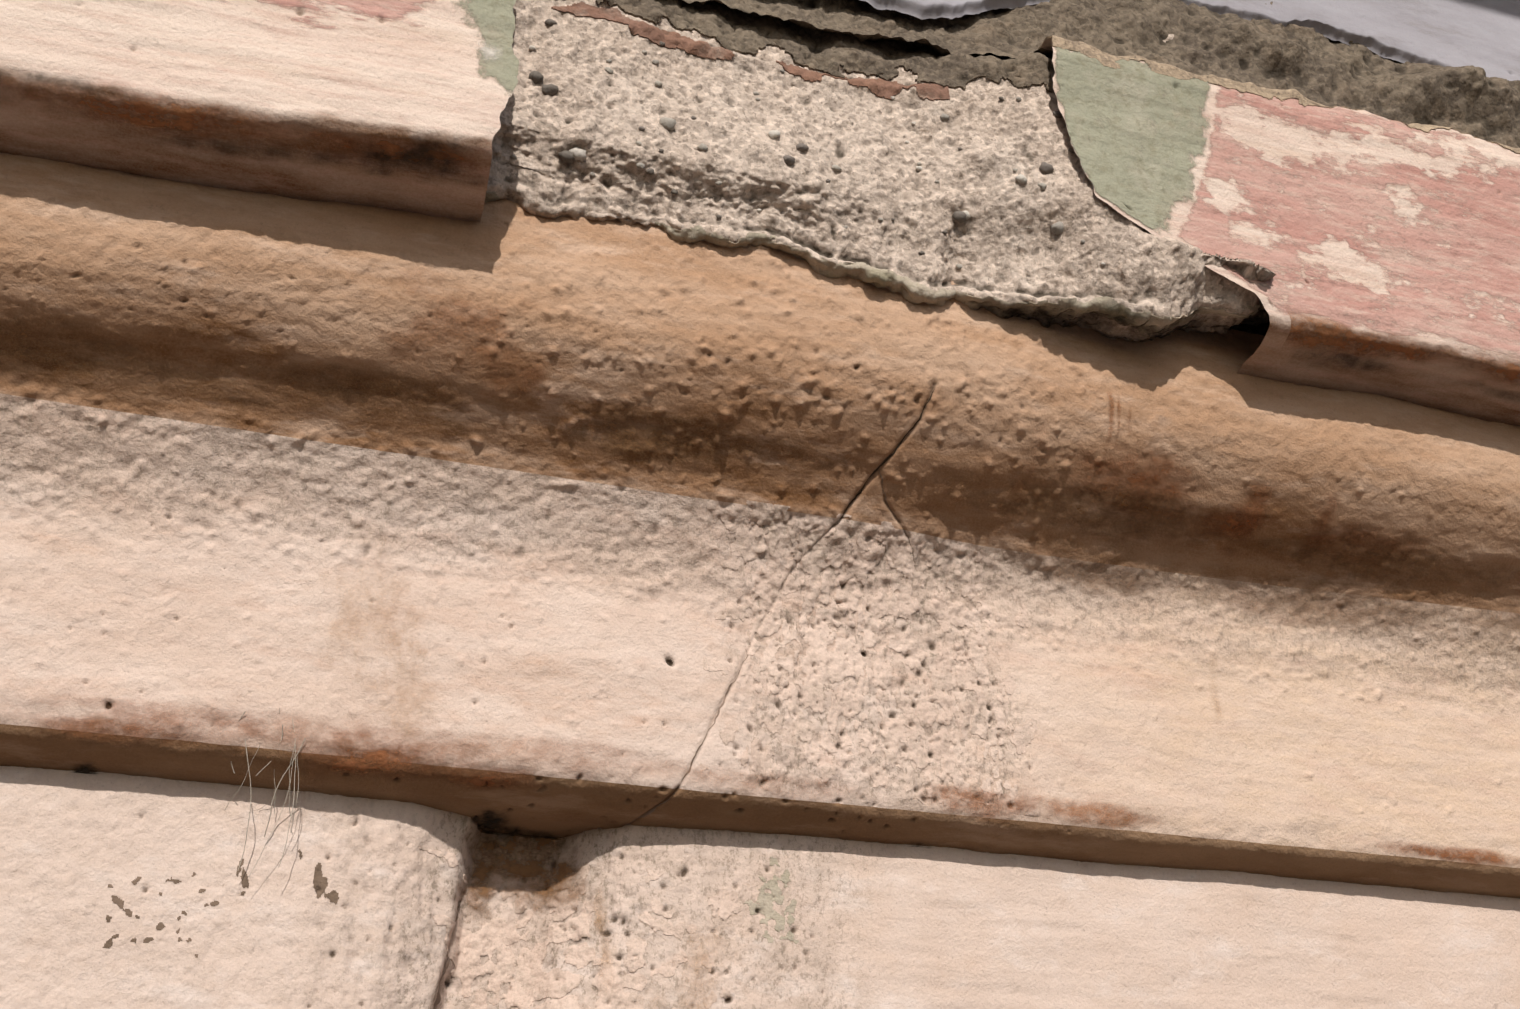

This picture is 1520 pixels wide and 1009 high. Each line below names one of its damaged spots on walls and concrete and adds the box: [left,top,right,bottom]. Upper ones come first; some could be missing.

peeling [258,0,436,29]
spalling [456,0,1520,358]
crack [629,390,934,824]